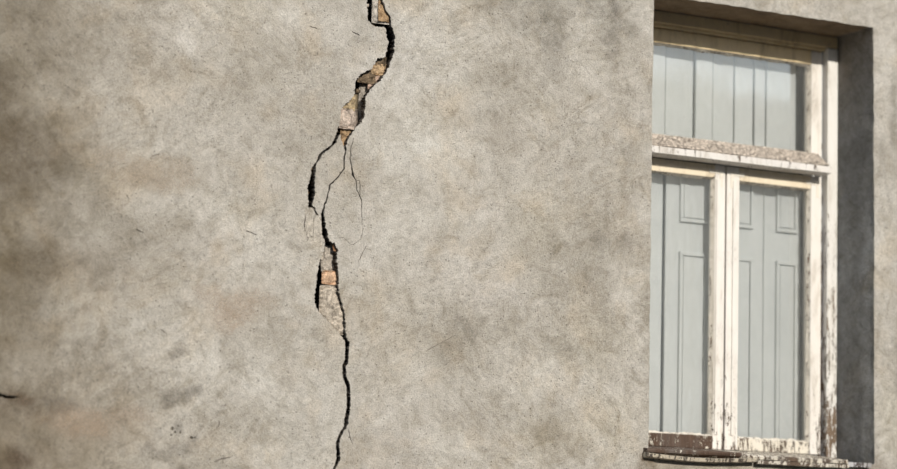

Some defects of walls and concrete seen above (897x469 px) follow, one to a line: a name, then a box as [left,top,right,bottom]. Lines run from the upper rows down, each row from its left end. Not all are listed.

crack [304,0,396,469]